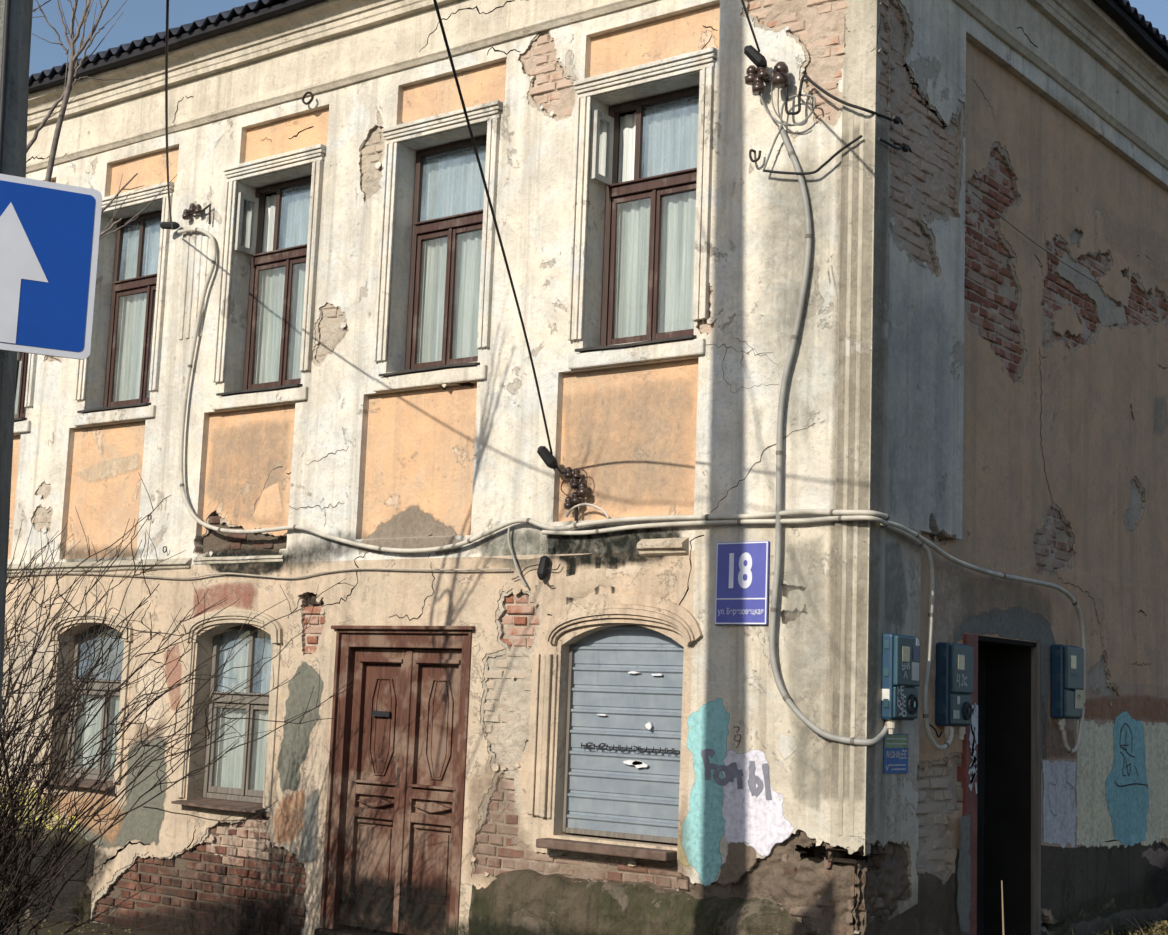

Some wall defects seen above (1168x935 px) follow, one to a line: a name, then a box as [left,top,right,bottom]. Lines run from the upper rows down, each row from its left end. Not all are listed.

crack [419,0,529,52]
spalling [506,30,576,121]
spalling [740,0,851,126]
spalling [876,0,1028,384]
spalling [312,302,349,366]
spalling [1041,226,1168,352]
spalling [1033,502,1077,576]
spalling [471,584,963,935]
spalling [90,807,309,935]